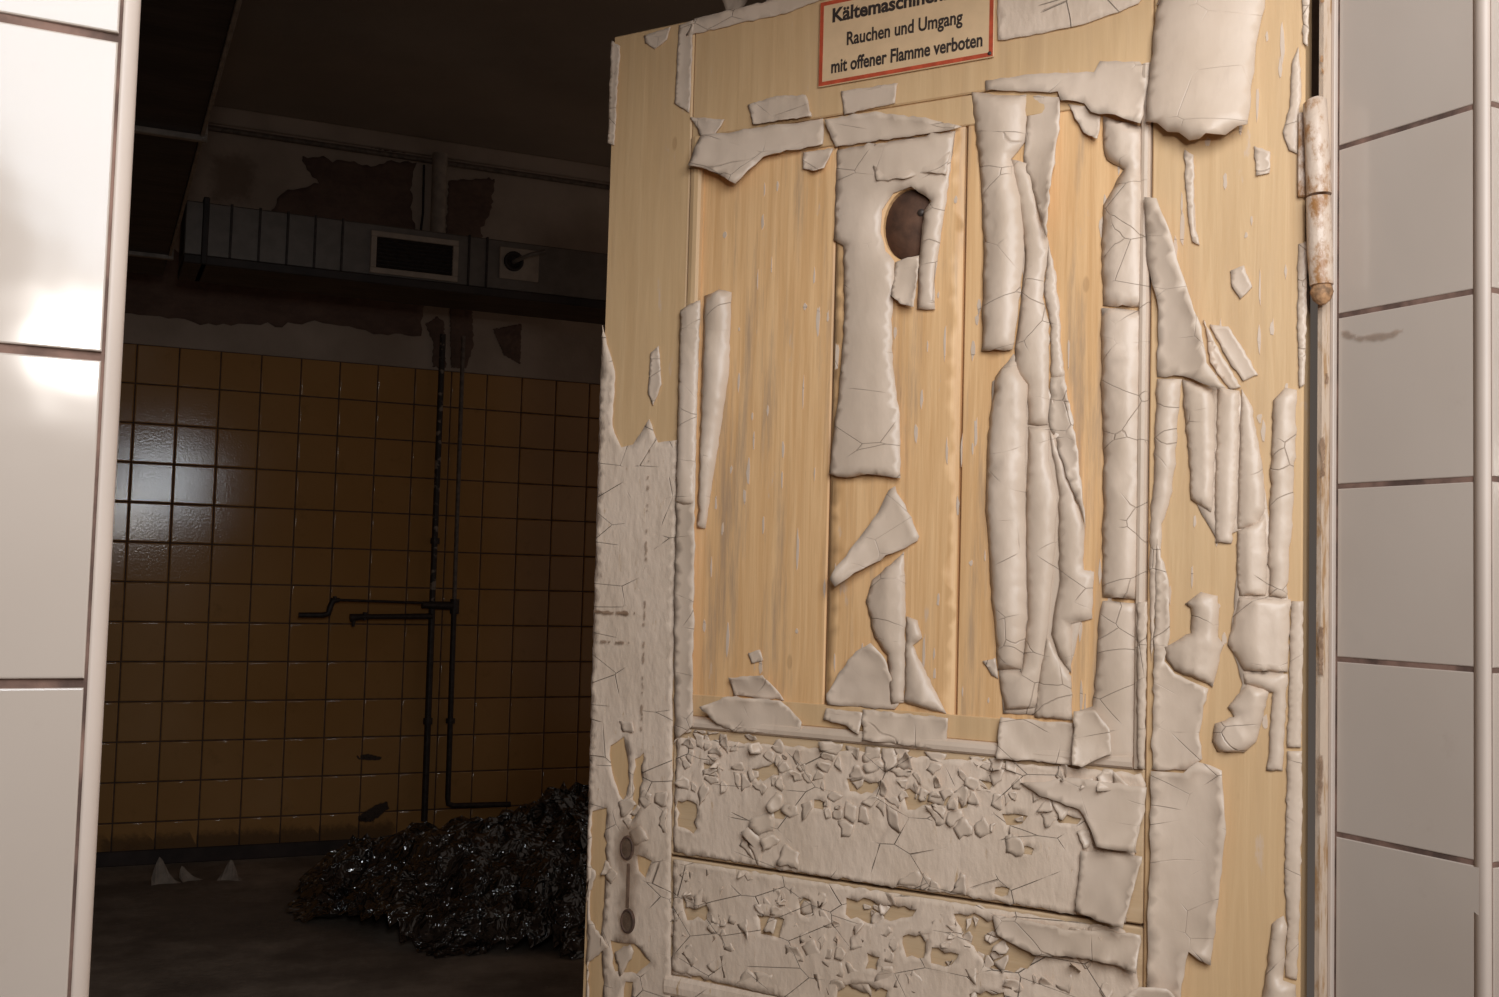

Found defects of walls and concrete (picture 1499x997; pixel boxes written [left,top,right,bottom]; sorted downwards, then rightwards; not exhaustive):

peeling [271,156,416,229]
peeling [446,177,495,238]
peeling [125,249,474,368]
peeling [493,324,522,364]
peeling [618,0,1323,997]
peeling [585,860,634,976]